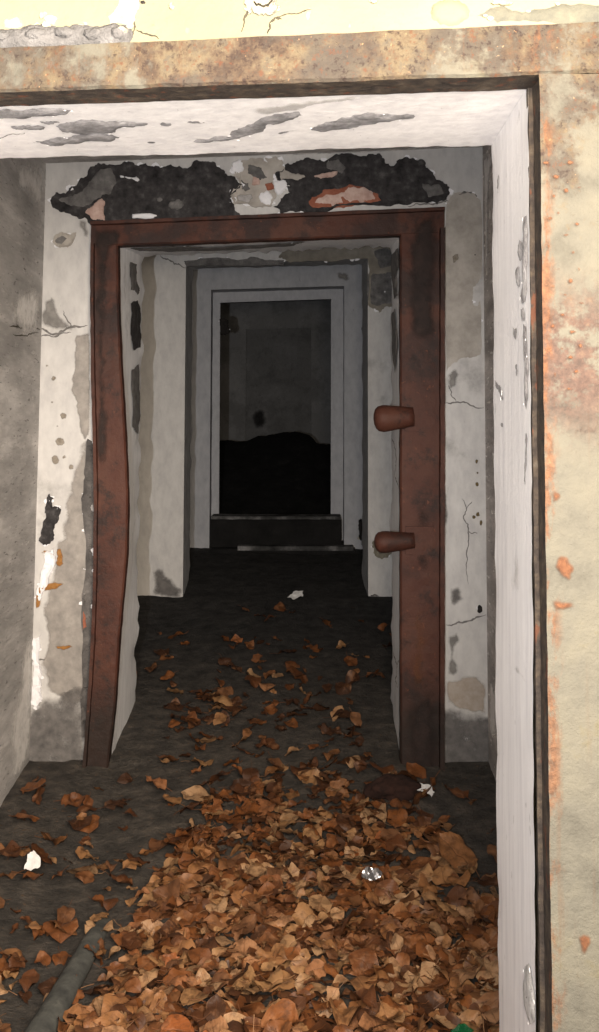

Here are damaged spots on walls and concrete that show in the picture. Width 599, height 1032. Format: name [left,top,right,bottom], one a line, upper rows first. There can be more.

peeling [0,0,146,48]
peeling [0,108,171,146]
peeling [194,112,301,143]
peeling [310,112,415,132]
peeling [47,153,454,224]
peeling [513,216,529,407]
peeling [34,494,61,601]
corrosion [36,583,62,608]
spalling [79,439,94,737]
corrosion [557,557,573,579]
peeling [31,635,44,710]
corrosion [580,936,590,952]